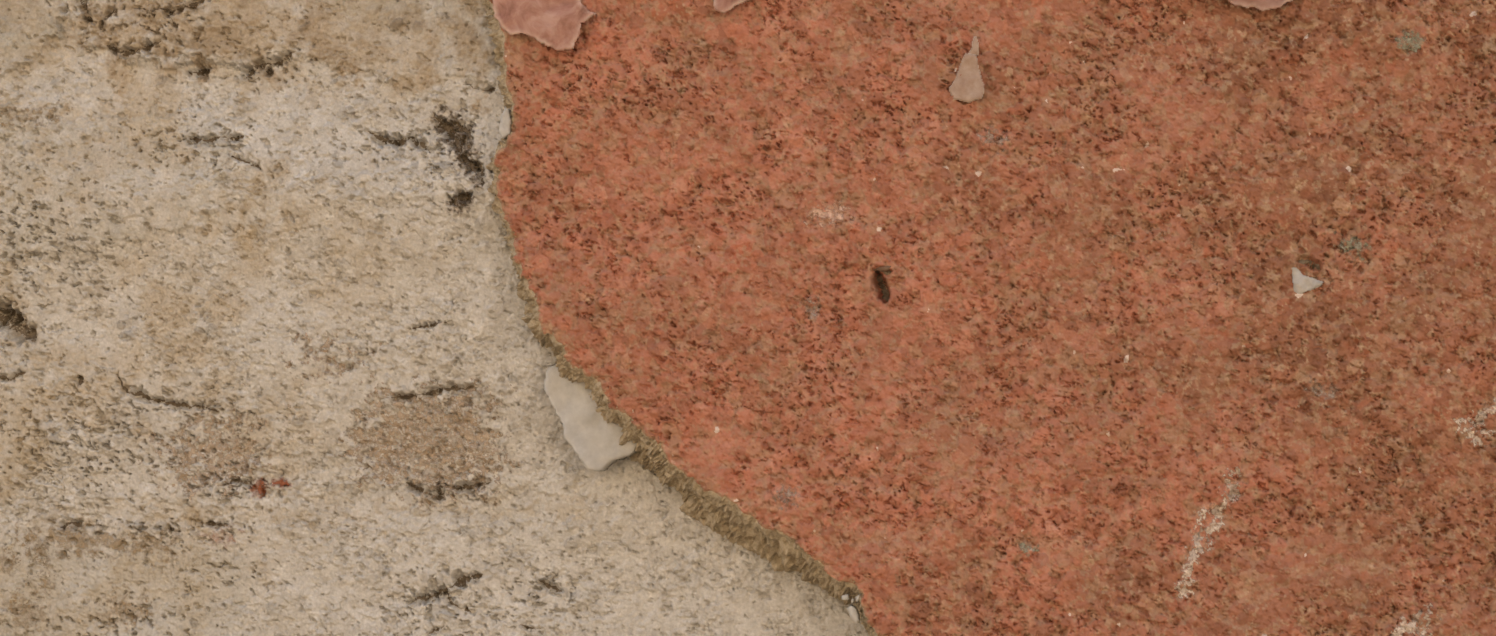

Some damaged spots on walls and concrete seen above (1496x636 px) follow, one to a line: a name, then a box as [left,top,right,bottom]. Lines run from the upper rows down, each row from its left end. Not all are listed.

spalling [483,0,881,636]
spalling [873,266,891,301]
spalling [138,408,271,500]
spalling [282,330,520,508]